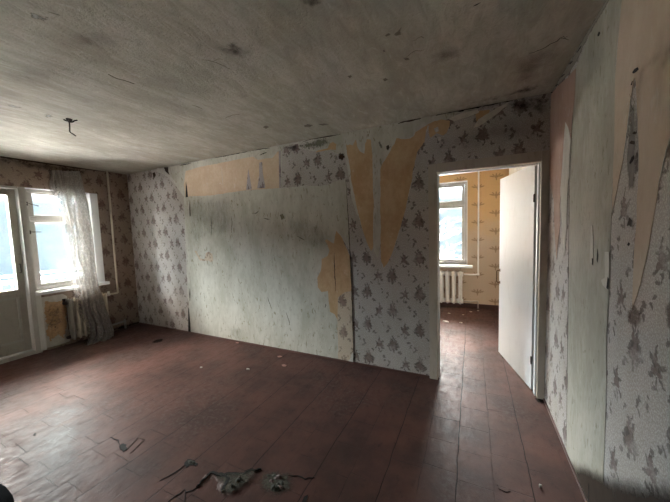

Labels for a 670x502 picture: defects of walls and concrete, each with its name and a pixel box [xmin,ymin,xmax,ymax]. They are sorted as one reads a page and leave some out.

peeling [41,294,70,348]